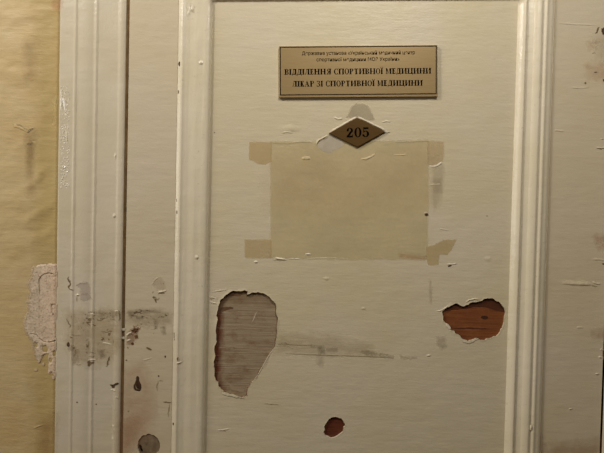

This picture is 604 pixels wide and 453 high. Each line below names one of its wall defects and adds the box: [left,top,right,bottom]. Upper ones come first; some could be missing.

peeling [316,104,392,153]
spalling [24,263,57,380]
peeling [208,287,280,399]
peeling [436,297,506,343]
peeling [323,415,347,439]